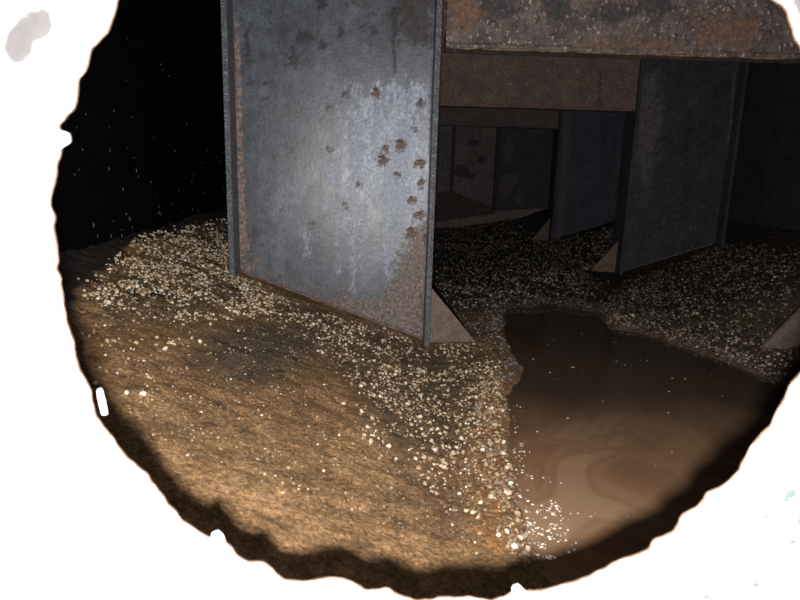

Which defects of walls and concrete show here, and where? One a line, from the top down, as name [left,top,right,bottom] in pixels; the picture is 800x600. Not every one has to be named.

corrosion [234,19,494,336]
damp [325,0,435,294]